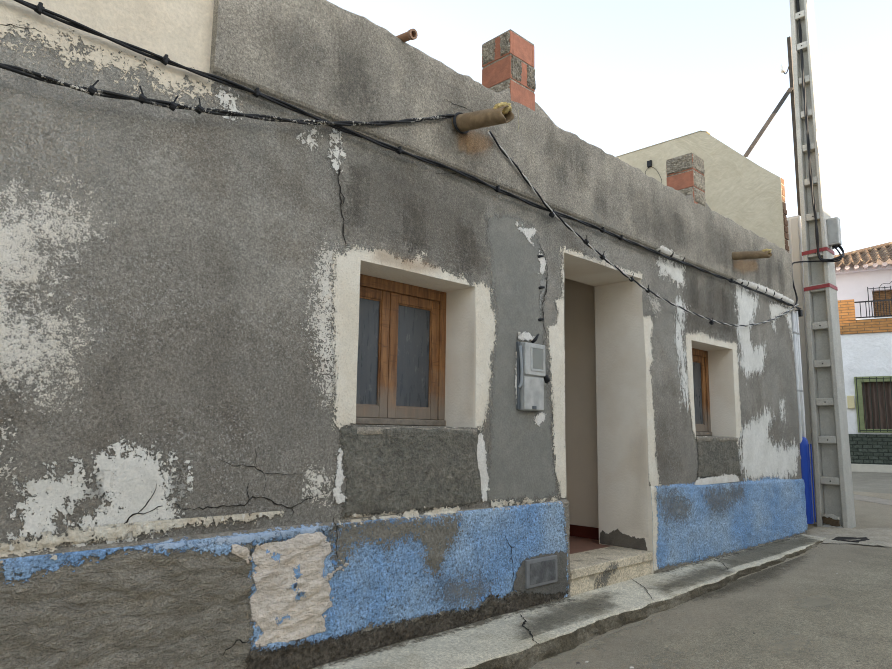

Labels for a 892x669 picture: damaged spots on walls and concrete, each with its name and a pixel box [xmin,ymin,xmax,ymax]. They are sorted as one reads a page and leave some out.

crack [338,130,346,245]
peeling [0,167,119,425]
peeling [733,279,797,386]
crack [125,449,329,523]
peeling [0,415,569,669]
peeling [654,397,801,528]